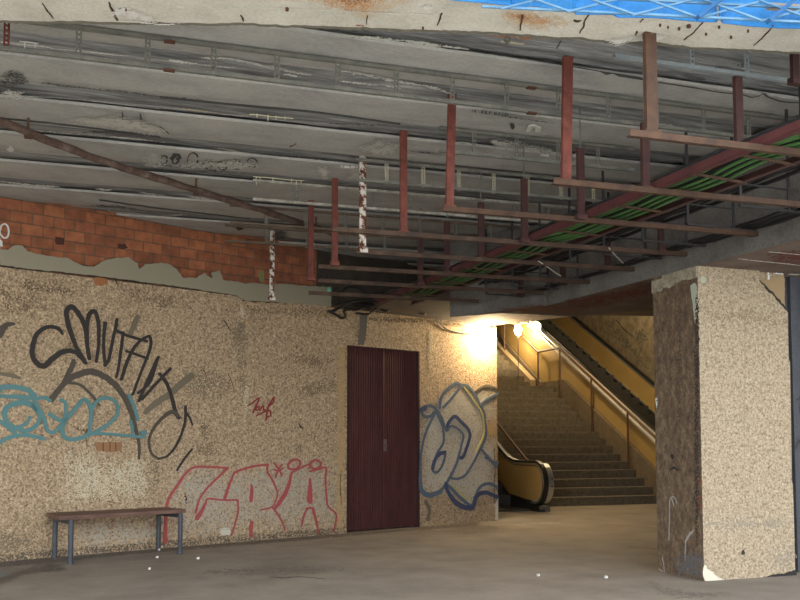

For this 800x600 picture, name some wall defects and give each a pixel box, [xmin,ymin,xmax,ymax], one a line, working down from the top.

rust [278,0,411,26]
rust [483,10,571,40]
crack [303,13,799,103]
flaking render [0,197,331,306]
crack [741,252,800,312]
spalling [703,565,724,581]